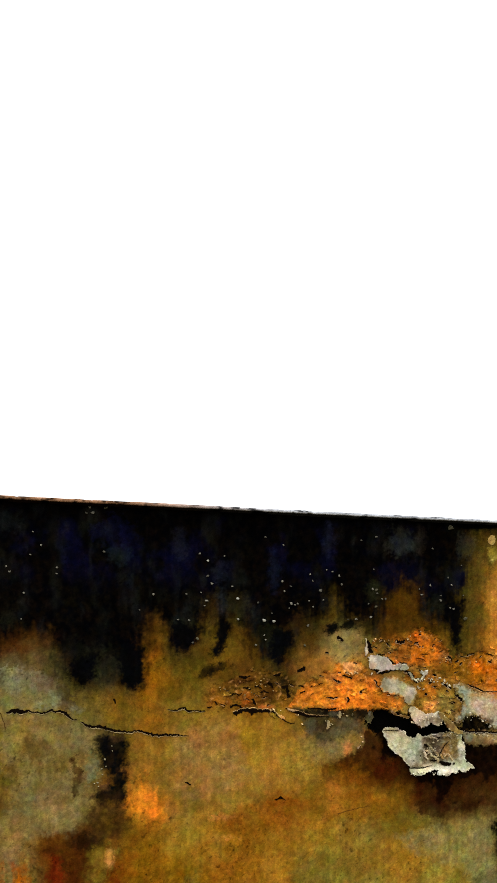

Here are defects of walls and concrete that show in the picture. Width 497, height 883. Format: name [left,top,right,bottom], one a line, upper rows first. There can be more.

corrosion [483,563,497,656]
crack [0,708,189,738]
crack [167,706,205,714]
damp [0,502,497,883]
crack [230,678,342,725]
flaking render [199,626,497,776]
corrosion [126,769,171,829]
corrosion [7,821,129,883]